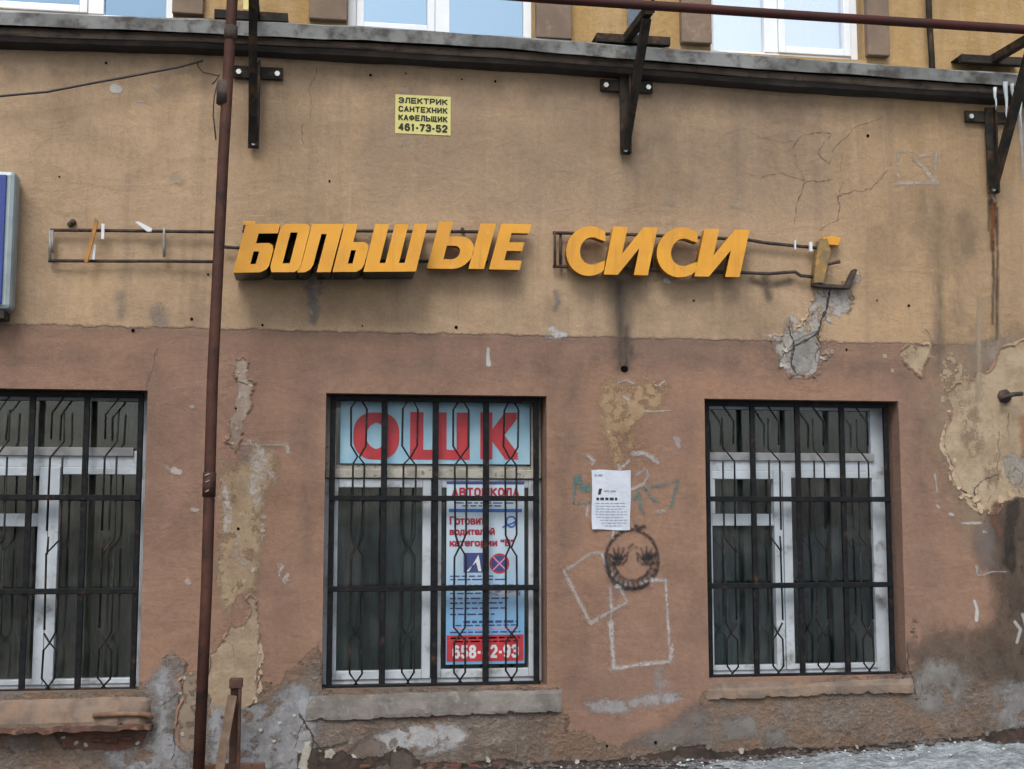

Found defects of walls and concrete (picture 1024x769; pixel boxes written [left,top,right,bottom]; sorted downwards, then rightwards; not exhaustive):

crack [725,115,892,230]
spalling [769,271,861,380]
rust [988,194,999,339]
peeling [599,377,670,466]
peeling [882,301,1024,515]
peeling [173,355,290,751]
leakage [908,497,1024,684]